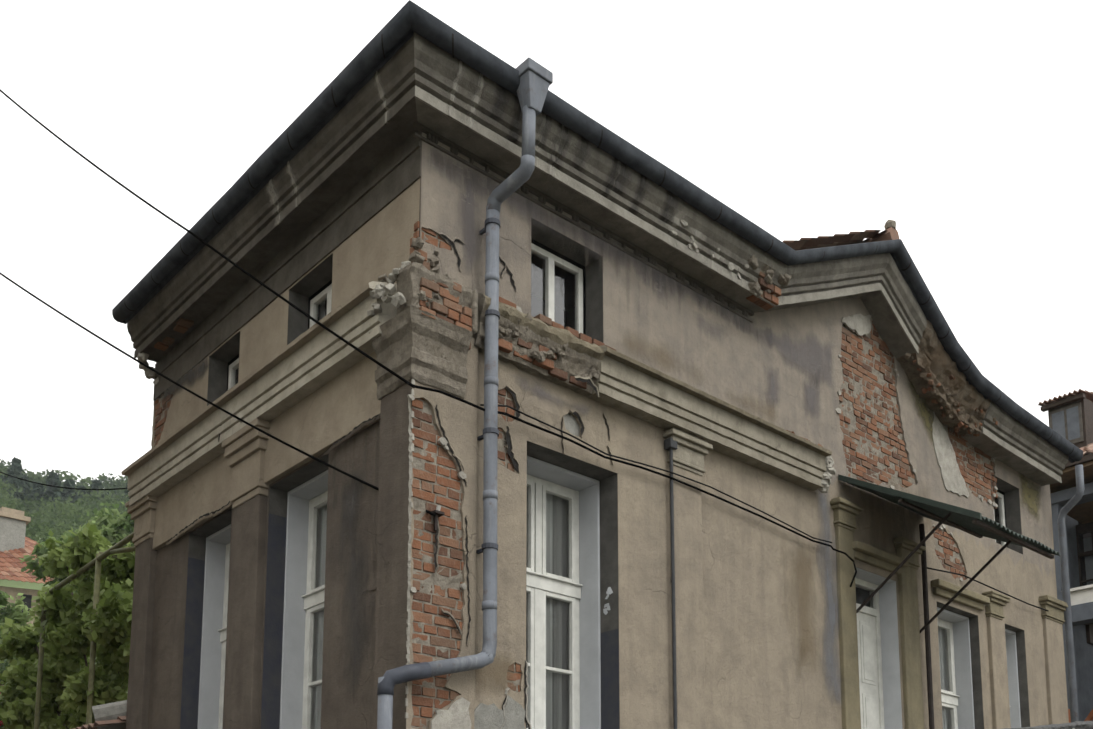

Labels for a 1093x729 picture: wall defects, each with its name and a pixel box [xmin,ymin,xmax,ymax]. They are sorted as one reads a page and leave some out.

spalling [367,221,472,350]
crack [439,232,465,271]
crack [499,255,517,291]
flaking render [710,246,781,310]
flaking render [151,394,173,446]
flaking render [497,388,516,472]
spalling [563,408,586,437]
flaking render [835,314,916,489]
flaking render [932,412,998,509]
flaking render [406,378,467,665]
flaking render [932,525,967,581]
flaking render [405,674,460,729]